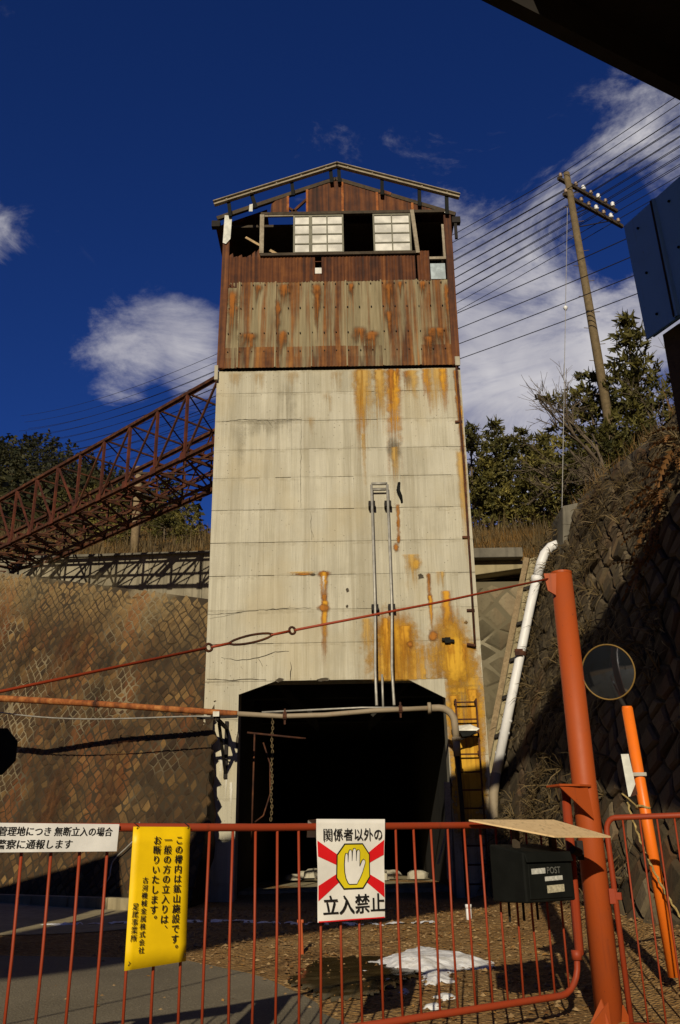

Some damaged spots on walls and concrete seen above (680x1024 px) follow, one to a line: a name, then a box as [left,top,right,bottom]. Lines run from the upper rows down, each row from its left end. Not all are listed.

corrosion [313,284,321,327]
corrosion [353,281,402,347]
corrosion [356,368,466,519]
corrosion [295,571,329,635]
corrosion [427,572,444,623]